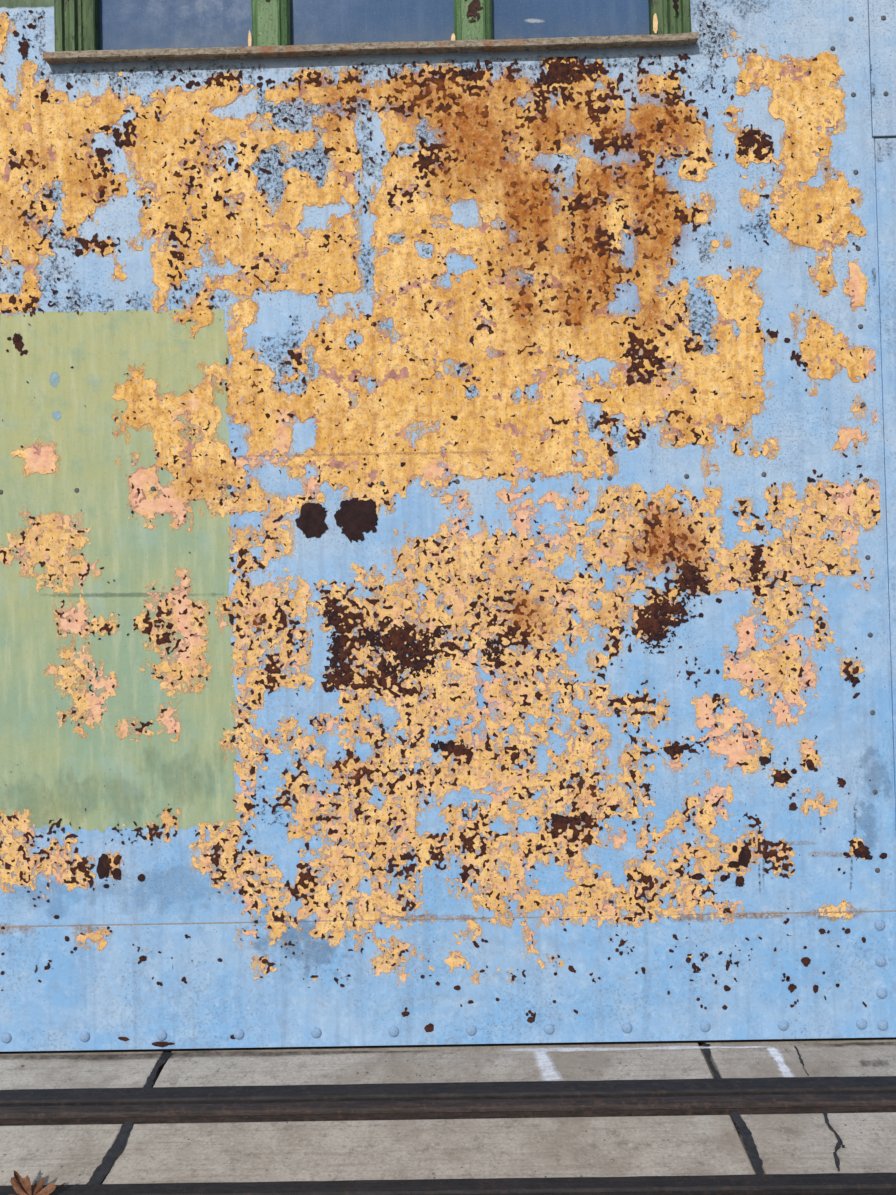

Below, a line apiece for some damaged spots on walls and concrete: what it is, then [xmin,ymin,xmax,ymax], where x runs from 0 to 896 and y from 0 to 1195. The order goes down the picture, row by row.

peeling [0,11,17,68]
rust [530,62,599,85]
rust [295,497,378,543]
peeling [0,53,881,986]
rust [322,605,448,693]
rust [483,638,505,667]
rust [759,722,850,830]
rust [655,804,814,1010]
rust [809,899,866,947]
crack [823,1112,846,1171]